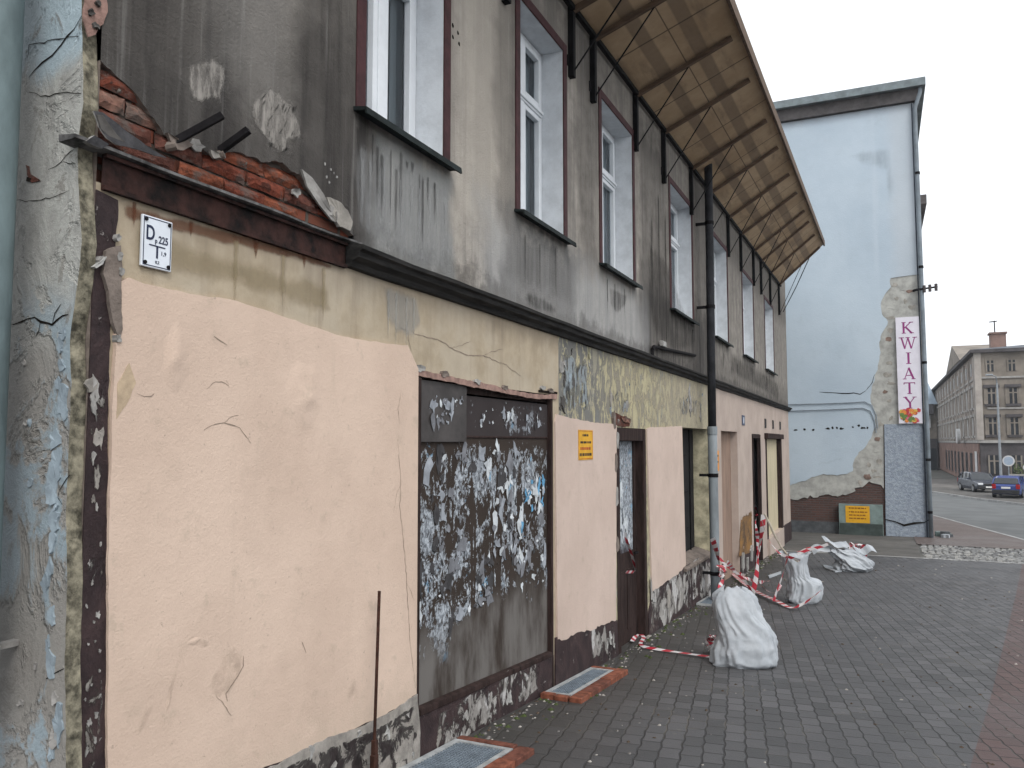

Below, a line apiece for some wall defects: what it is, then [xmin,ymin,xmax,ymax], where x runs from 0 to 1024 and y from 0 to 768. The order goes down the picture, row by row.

crack [27,17,81,97]
flaking render [98,69,353,231]
crack [13,304,68,336]
crack [401,312,521,376]
flaking render [790,274,925,500]
peeling [83,363,136,512]
peeling [27,327,69,762]
peeling [650,558,711,626]
peeling [591,625,616,660]
peeling [84,669,103,768]
flaking render [268,694,420,768]
peeling [436,658,538,748]